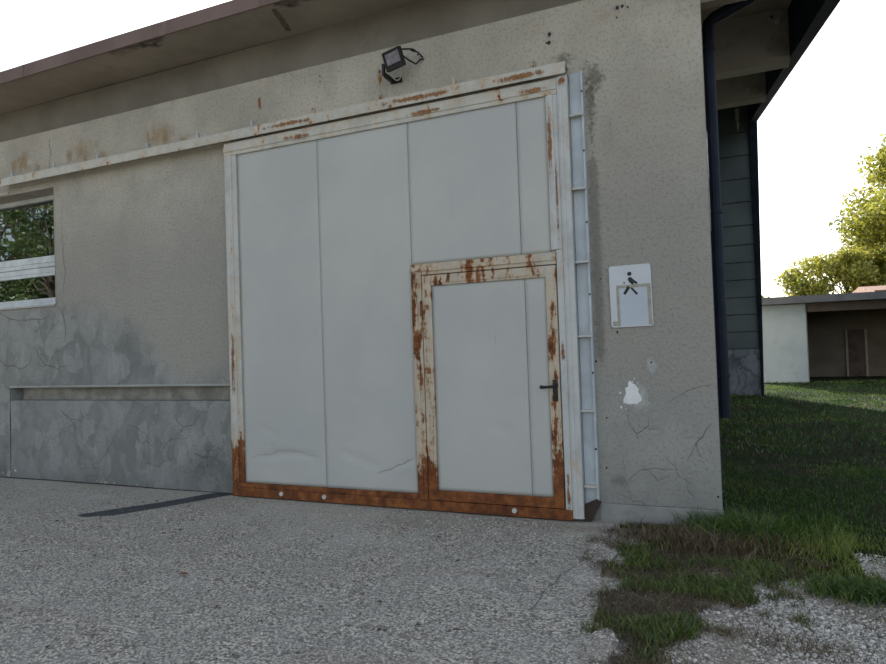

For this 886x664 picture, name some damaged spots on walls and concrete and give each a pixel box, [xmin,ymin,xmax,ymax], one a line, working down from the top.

corrosion [500,70,541,82]
corrosion [382,91,447,116]
corrosion [264,118,309,139]
corrosion [547,119,558,207]
peeling [619,378,649,410]